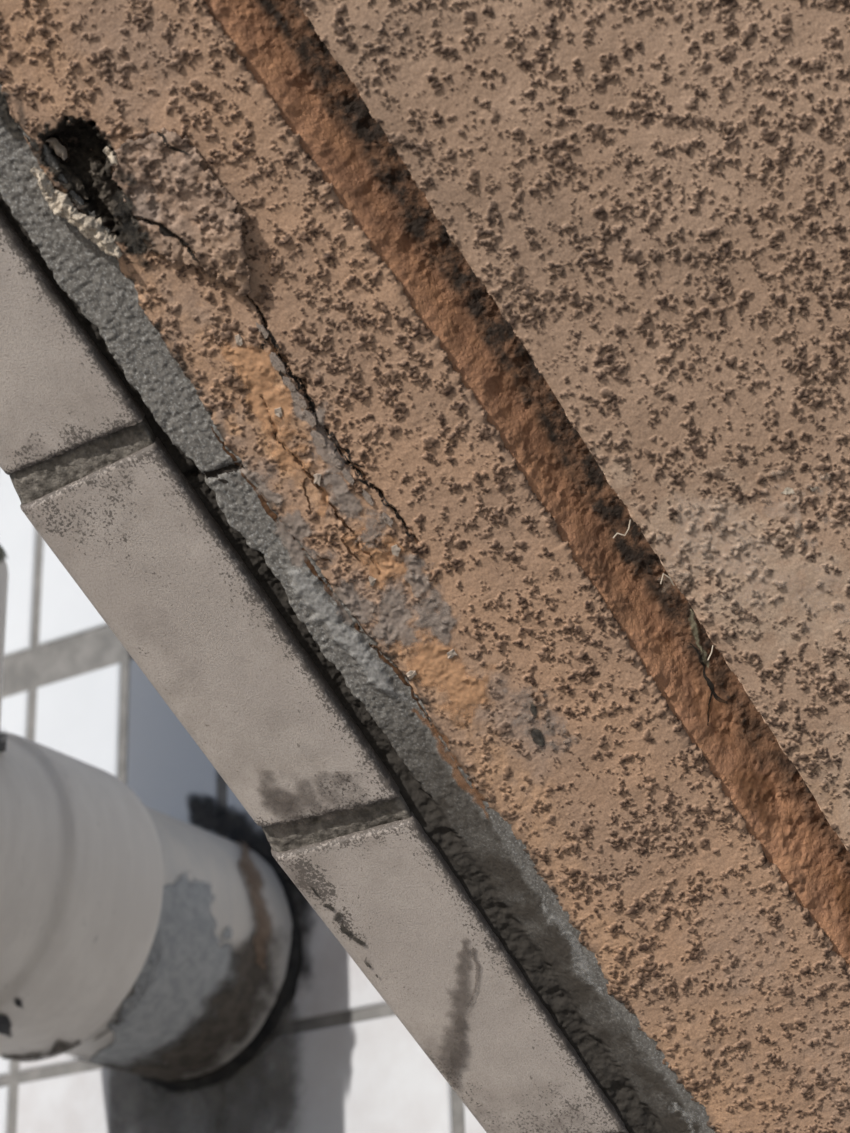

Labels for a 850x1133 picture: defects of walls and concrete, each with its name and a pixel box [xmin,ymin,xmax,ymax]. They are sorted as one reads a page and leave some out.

peeling [30,116,251,297]
crack [191,295,436,731]
damp [440,941,481,1088]